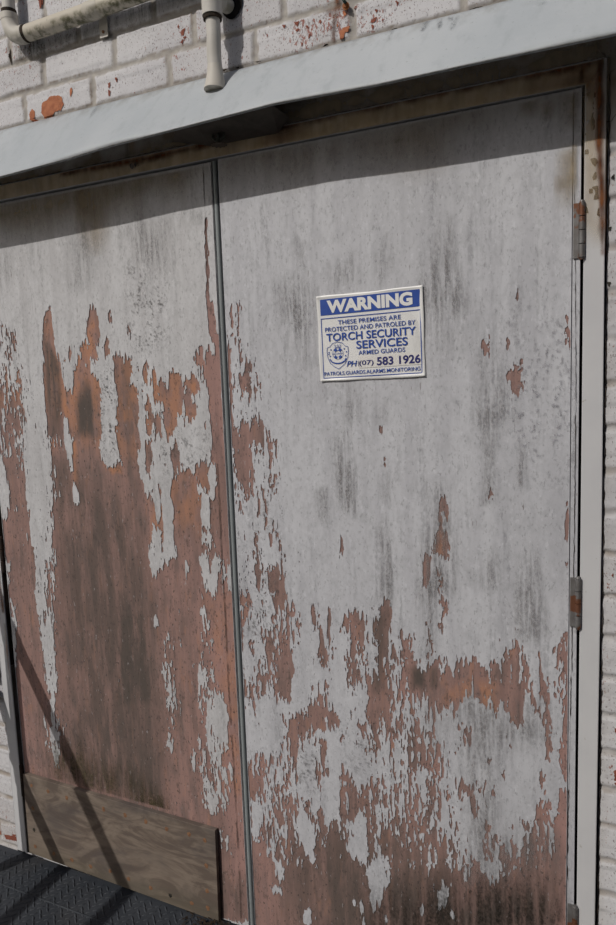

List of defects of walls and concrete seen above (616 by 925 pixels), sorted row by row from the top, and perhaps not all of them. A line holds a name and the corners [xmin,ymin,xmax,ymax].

corrosion [525,60,605,238]
peeling [0,218,568,925]